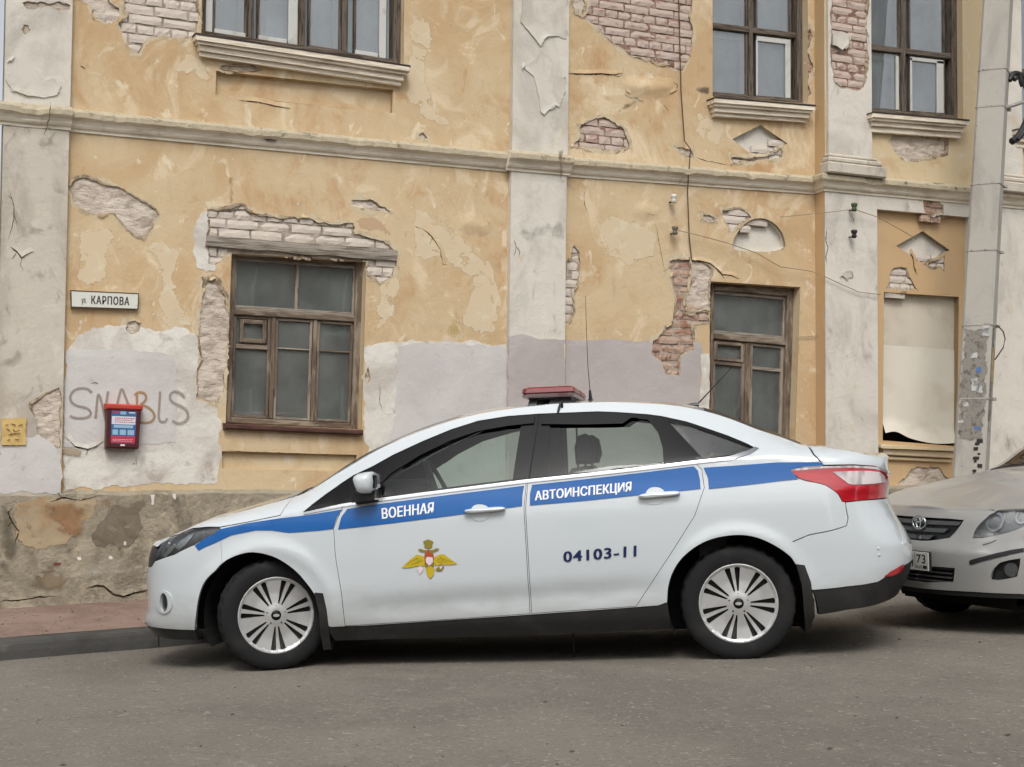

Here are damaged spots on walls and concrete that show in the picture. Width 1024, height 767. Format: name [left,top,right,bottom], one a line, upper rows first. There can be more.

flaking render [22,0,263,81]
flaking render [520,0,697,115]
flaking render [830,0,870,91]
flaking render [568,113,632,154]
flaking render [728,139,786,167]
flaking render [888,135,949,162]
flaking render [68,174,401,409]
flaking render [565,243,583,327]
flaking render [649,253,716,376]
flaking render [884,250,946,299]
flaking render [28,387,62,448]